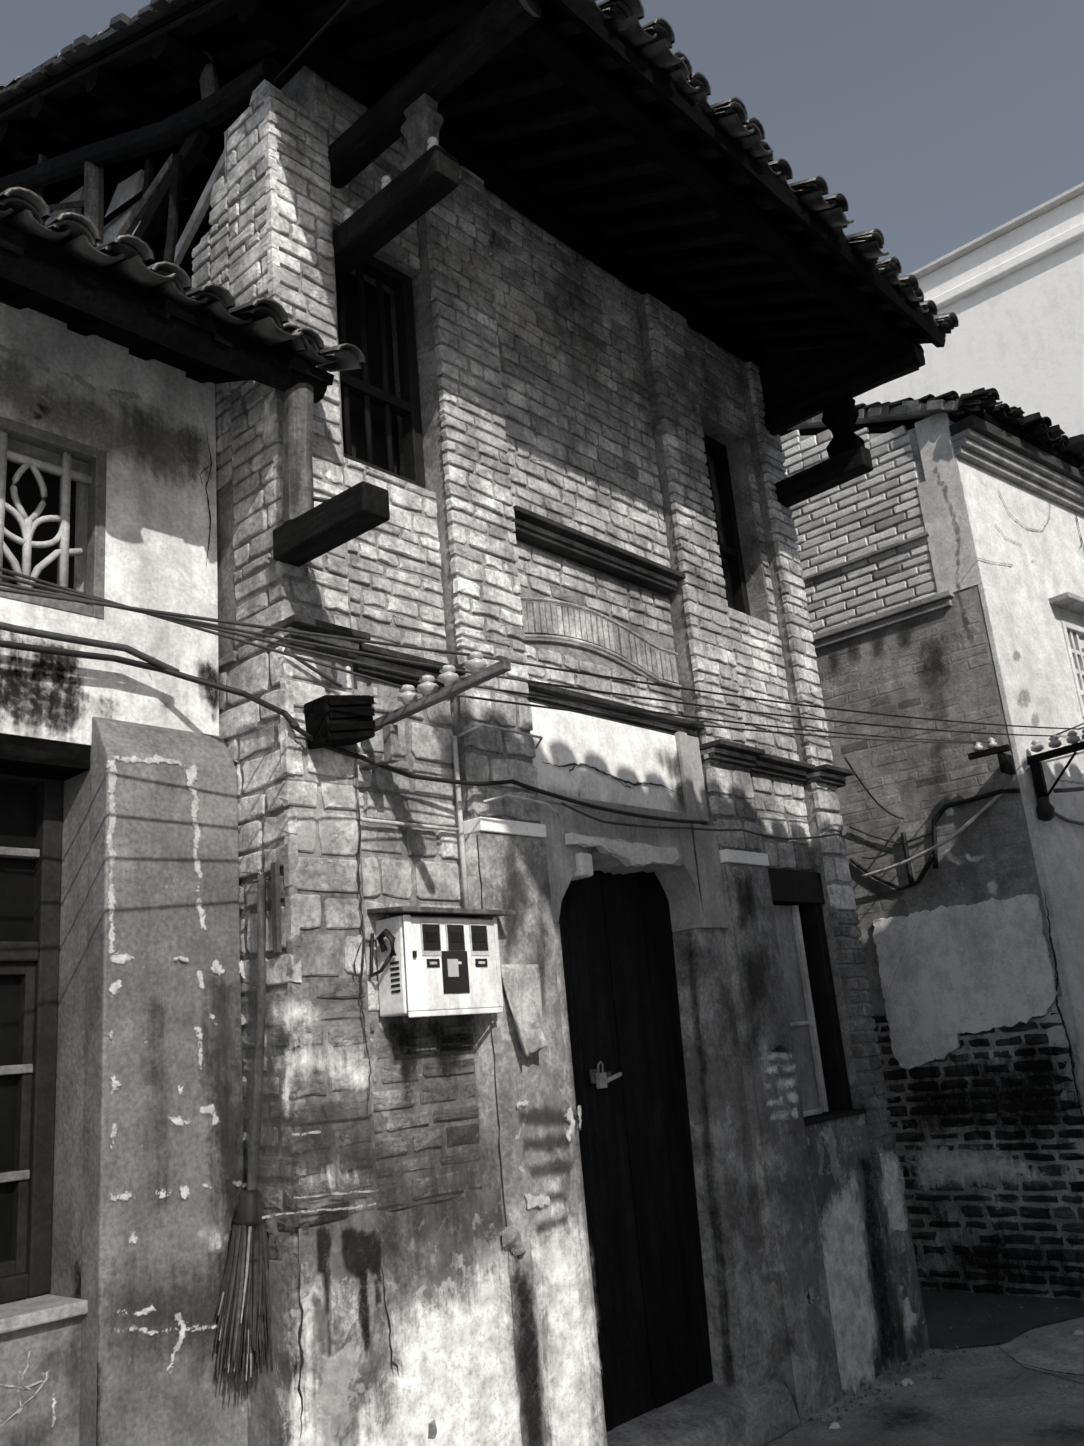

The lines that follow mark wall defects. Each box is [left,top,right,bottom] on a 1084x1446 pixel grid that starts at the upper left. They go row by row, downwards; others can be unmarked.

water stain [0,359,212,479]
water stain [0,631,112,733]
crack [542,762,681,796]
peeling [105,754,207,995]
peeling [174,956,245,989]
peeling [193,1013,217,1070]
peeling [168,1104,220,1127]
peeling [155,1183,213,1199]
water stain [689,950,734,1386]
peeling [115,1305,222,1336]
water stain [289,1225,381,1446]
water stain [358,1182,599,1446]